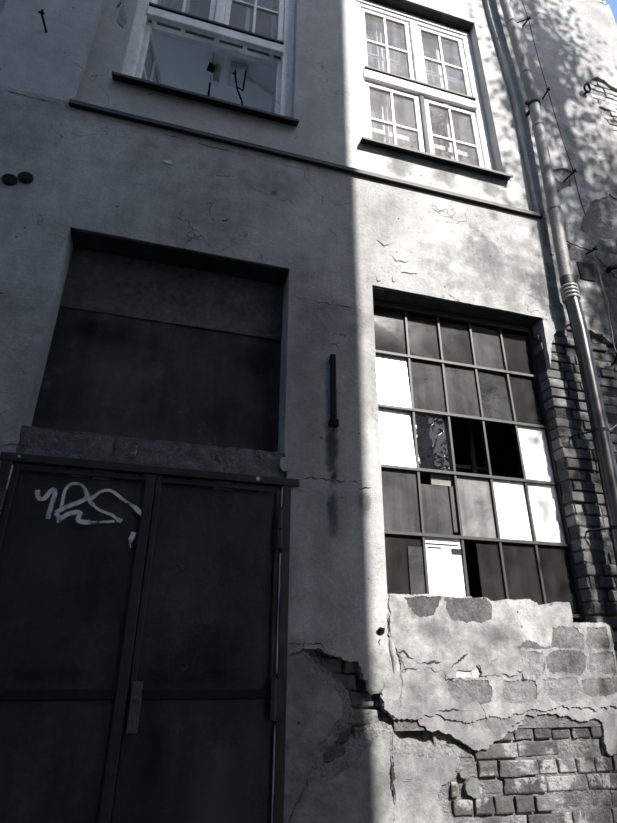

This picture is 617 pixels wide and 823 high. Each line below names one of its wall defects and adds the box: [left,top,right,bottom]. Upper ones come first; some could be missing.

flaking render [588,80,617,134]
flaking render [579,194,617,239]
flaking render [377,255,418,282]
flaking render [502,324,617,704]
peeling [426,543,462,555]
flaking render [404,596,492,623]
flaking render [284,648,617,823]